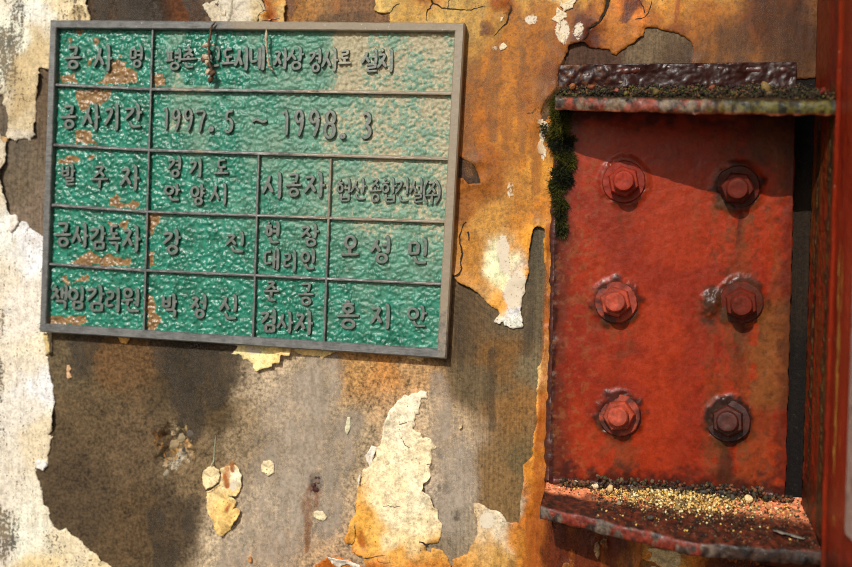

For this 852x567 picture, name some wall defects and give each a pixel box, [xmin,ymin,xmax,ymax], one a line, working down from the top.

peeling [0,0,91,169]
crack [426,0,483,16]
crack [582,0,610,40]
peeling [374,0,818,329]
corrosion [622,0,641,22]
peeling [0,181,111,567]
water stain [149,339,245,444]
peeling [202,464,242,537]
water stain [216,352,363,567]
water stain [429,371,477,535]
peeling [315,391,738,567]
corrosion [525,223,632,567]